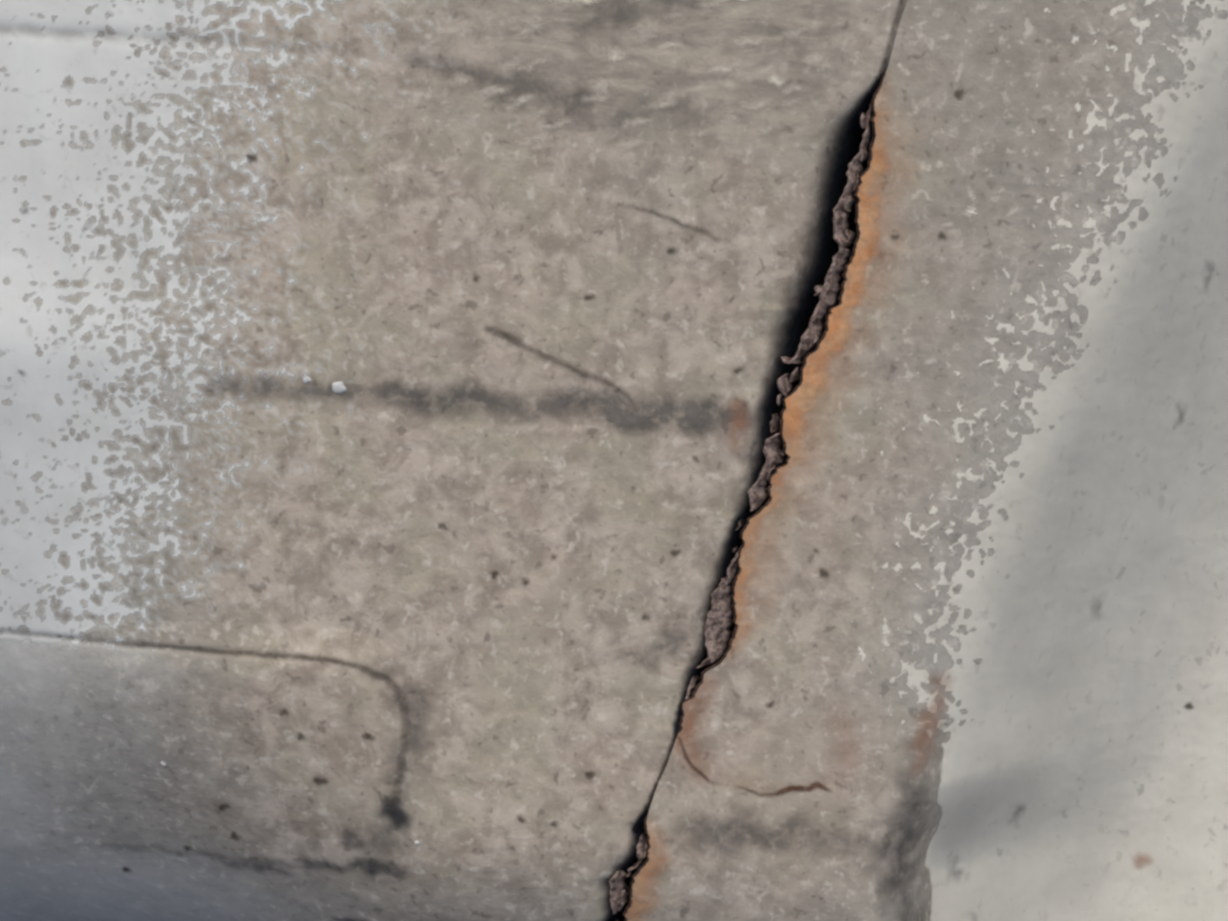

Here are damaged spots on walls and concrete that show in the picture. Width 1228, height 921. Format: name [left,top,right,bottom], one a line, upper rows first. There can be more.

water stain [378,385,521,412]
water stain [538,394,746,432]
crack [605,46,890,921]
corrosion [734,113,886,618]